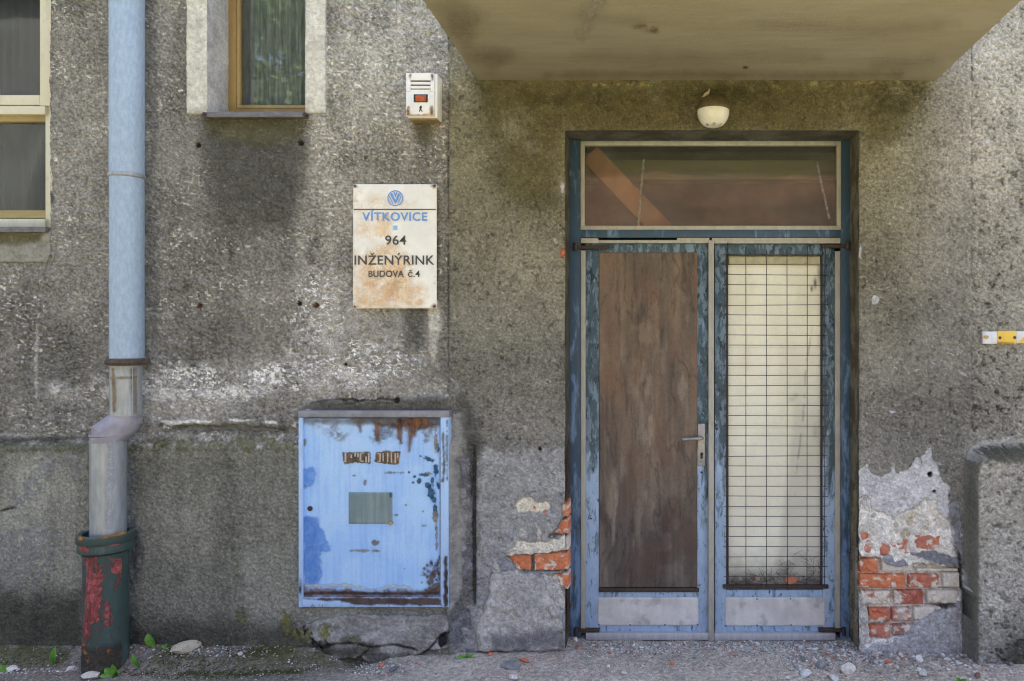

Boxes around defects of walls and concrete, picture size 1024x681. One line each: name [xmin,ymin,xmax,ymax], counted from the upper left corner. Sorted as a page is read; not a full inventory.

damp [203,119,307,222]
flaking render [299,441,584,668]
flaking render [849,448,971,664]